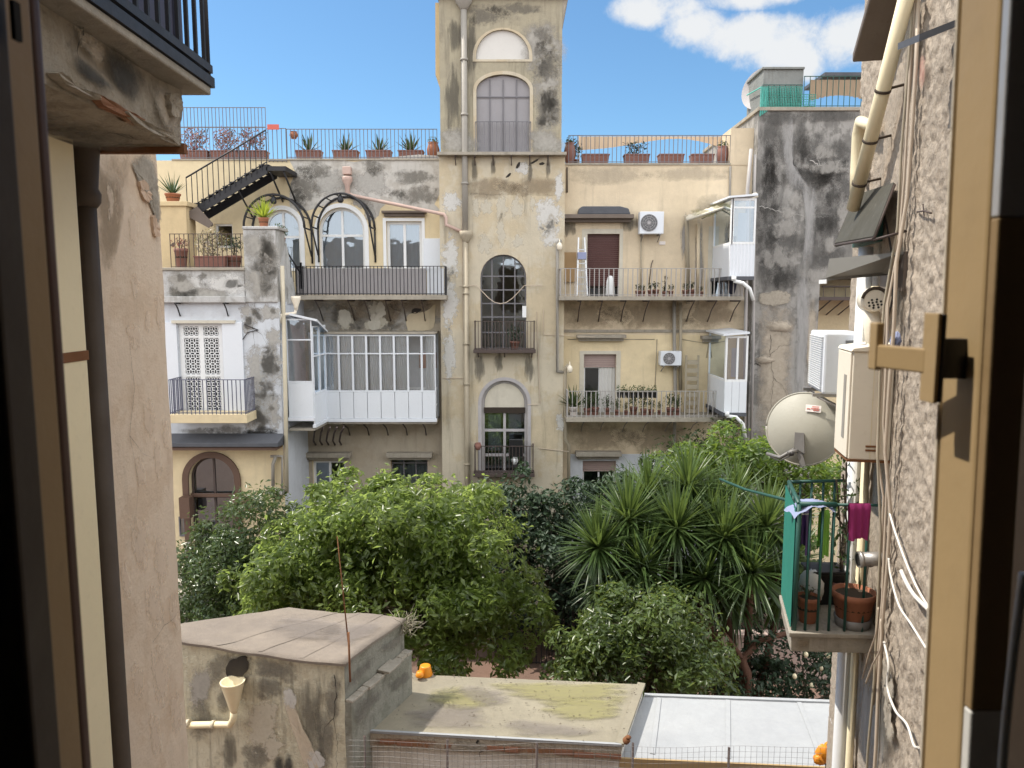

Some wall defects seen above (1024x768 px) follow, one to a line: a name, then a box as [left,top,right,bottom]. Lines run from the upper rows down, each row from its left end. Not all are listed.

spalling [46,72,183,137]
leakage [525,24,565,177]
flaking render [133,155,161,237]
leakage [392,171,436,203]
peeling [535,173,563,246]
leakage [169,274,226,296]
leakage [242,233,280,300]
leakage [756,111,855,392]
leakage [195,699,211,730]
leakage [225,740,292,768]
leakage [303,682,337,759]
crack [323,675,338,764]